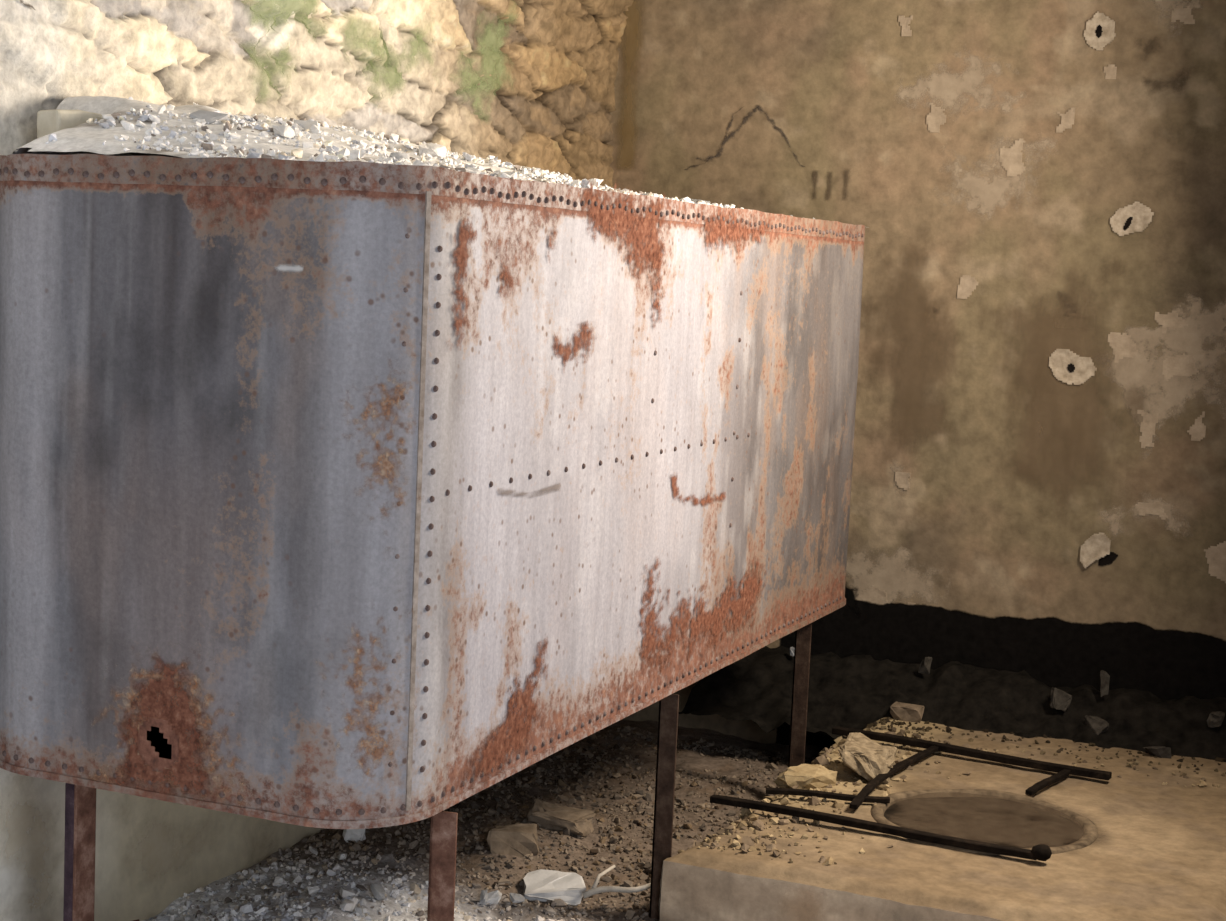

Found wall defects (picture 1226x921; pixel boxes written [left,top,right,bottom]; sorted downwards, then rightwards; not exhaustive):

peeling [1154,0,1201,28]
spalling [0,0,633,188]
crack [684,105,805,170]
peeling [1096,296,1226,448]